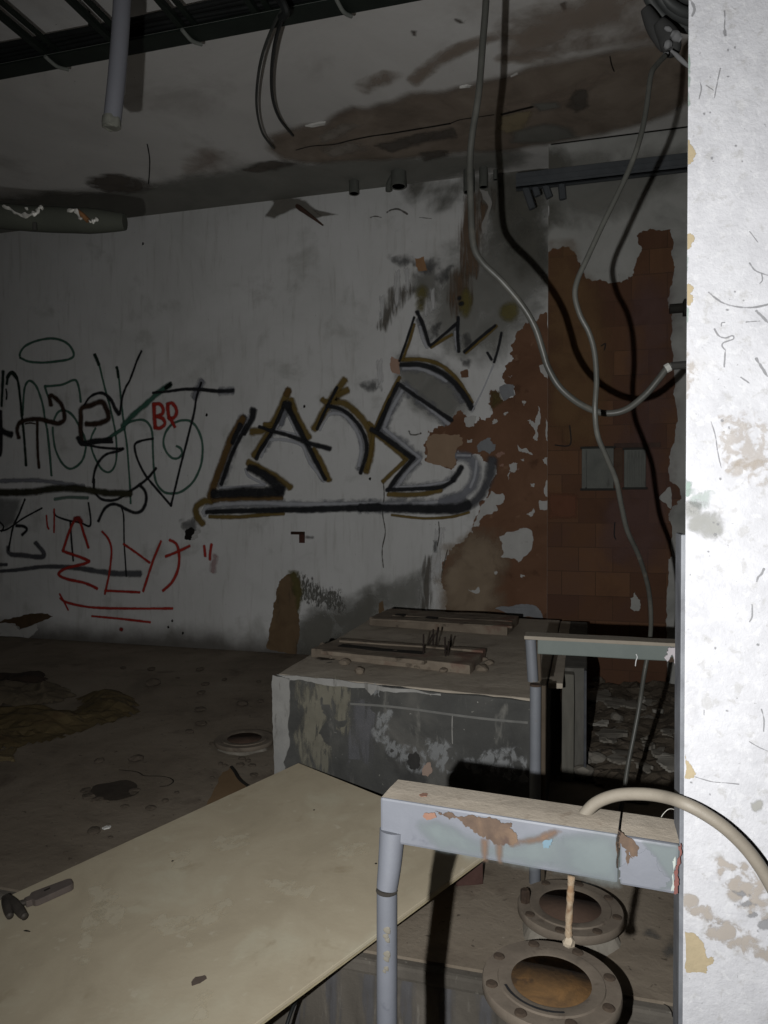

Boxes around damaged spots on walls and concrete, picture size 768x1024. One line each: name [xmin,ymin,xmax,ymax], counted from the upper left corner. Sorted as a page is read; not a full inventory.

crack [297,106,533,150]
water stain [0,0,688,365]
water stain [399,361,463,418]
peeling [423,228,691,685]
peeling [266,571,302,654]
peeling [272,674,441,777]
peeling [425,824,768,973]